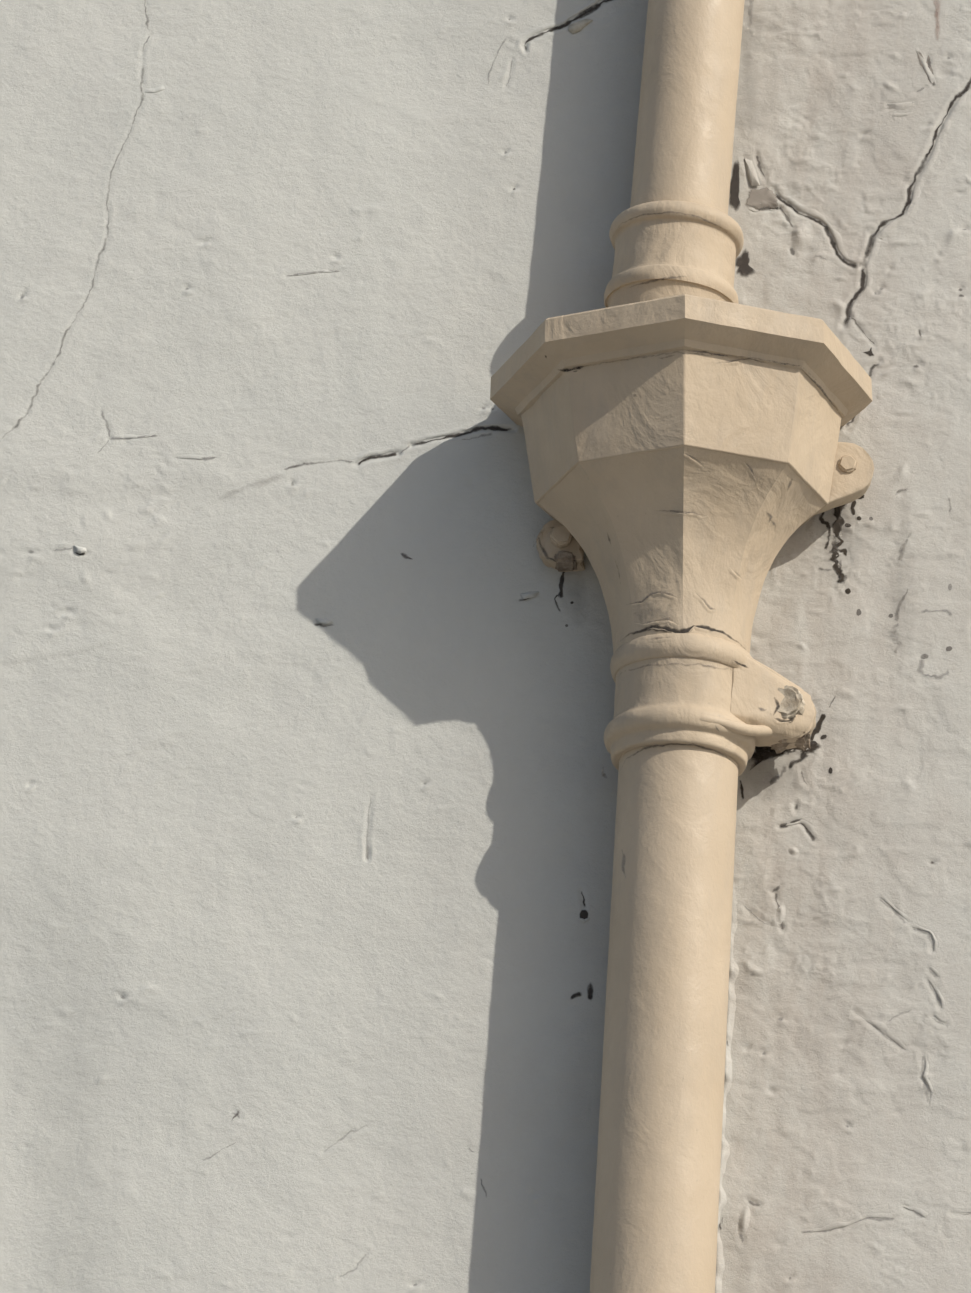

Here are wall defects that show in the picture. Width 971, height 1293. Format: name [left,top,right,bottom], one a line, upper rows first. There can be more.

crack [525,0,612,49]
spalling [730,156,779,212]
crack [776,80,971,343]
spalling [736,250,754,276]
crack [110,431,218,460]
crack [287,423,514,469]
crack [801,1205,971,1233]